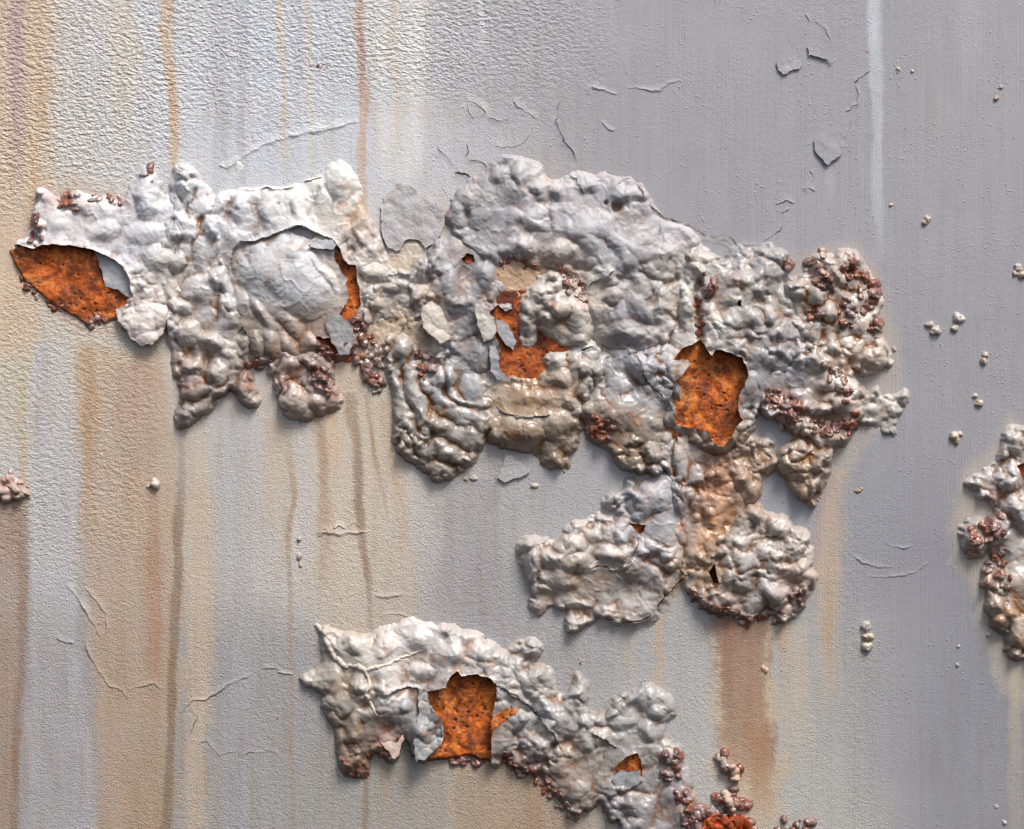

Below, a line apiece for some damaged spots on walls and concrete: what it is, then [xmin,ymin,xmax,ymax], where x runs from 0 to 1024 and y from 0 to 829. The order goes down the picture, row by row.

peeling [776,43,833,74]
crack [431,96,588,194]
peeling [814,119,851,165]
peeling [380,183,446,251]
rust [785,234,905,396]
rust [0,0,221,829]
rust [693,426,884,829]